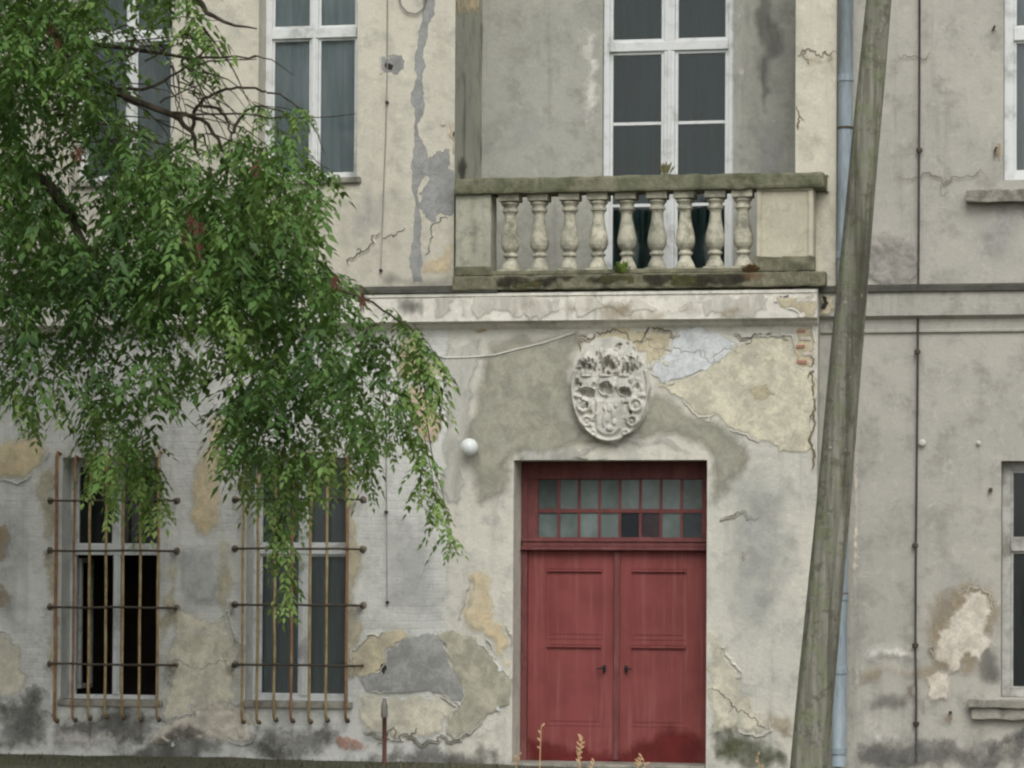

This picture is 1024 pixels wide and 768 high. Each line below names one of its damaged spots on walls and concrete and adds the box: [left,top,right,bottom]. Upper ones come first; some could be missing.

damp [758,0,778,82]
crack [799,48,836,64]
crack [346,0,449,282]
crack [577,327,816,469]
flaking render [586,308,817,452]
flaking render [191,408,226,534]
crack [720,510,760,522]
peeling [926,585,994,700]
damp [0,688,43,748]
damp [58,707,211,757]
damp [257,725,338,760]
flaking render [360,687,465,741]